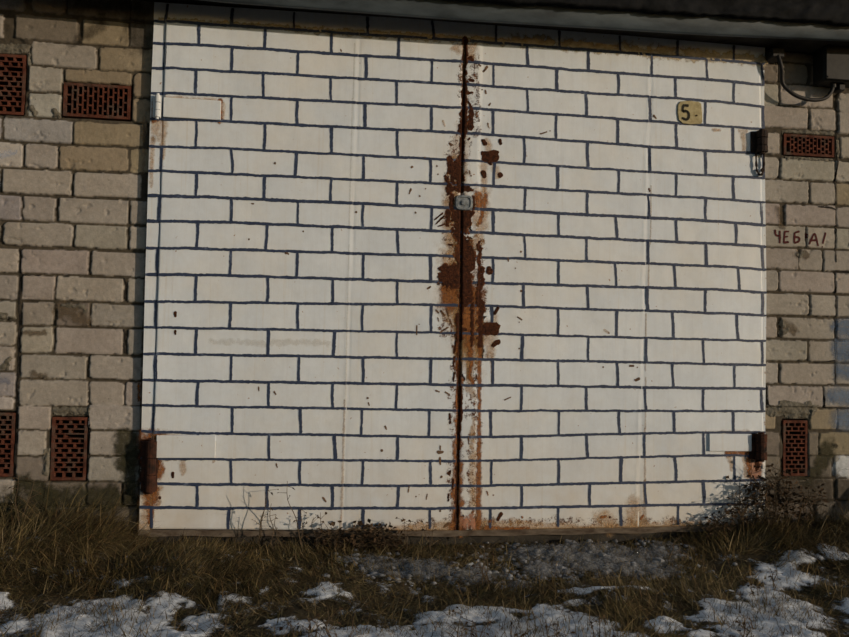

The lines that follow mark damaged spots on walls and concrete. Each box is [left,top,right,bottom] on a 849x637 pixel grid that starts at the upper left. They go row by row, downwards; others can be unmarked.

corrosion [350,36,703,537]
corrosion [137,430,183,530]
corrosion [725,451,762,479]